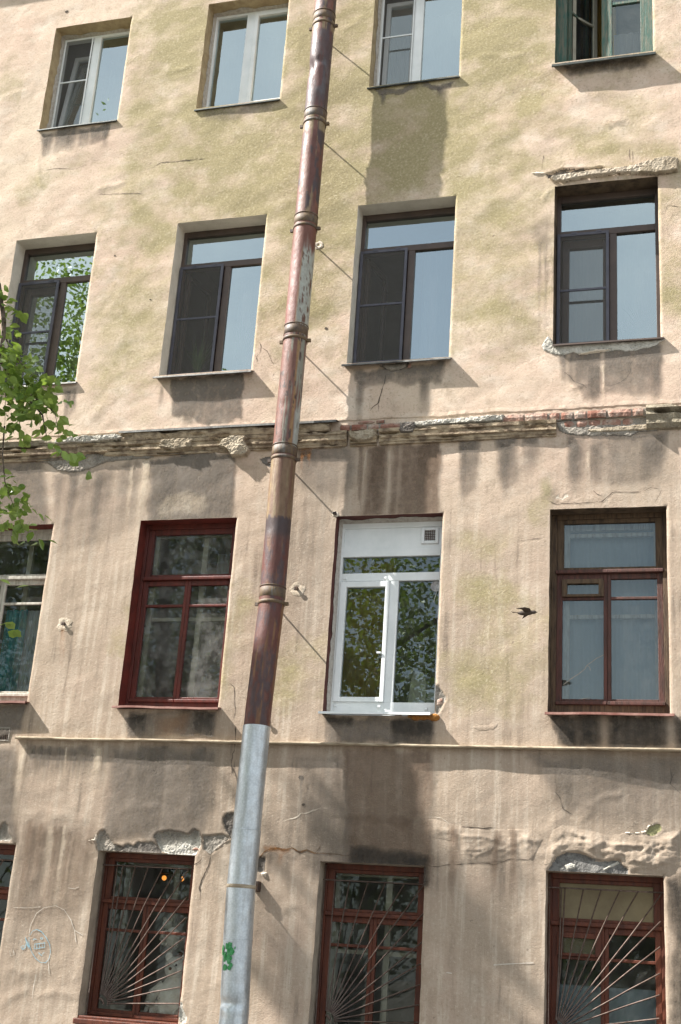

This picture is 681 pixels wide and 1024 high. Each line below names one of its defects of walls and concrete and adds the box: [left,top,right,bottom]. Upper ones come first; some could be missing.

water stain [375,82,453,99]
flaking render [532,156,679,184]
flaking render [340,408,657,445]
water stain [497,438,536,469]
water stain [142,453,235,520]
water stain [307,443,440,515]
water stain [325,716,433,886]
flaking render [88,812,234,855]
peeling [625,824,661,836]
crack [194,841,227,897]
flaking render [548,852,628,874]